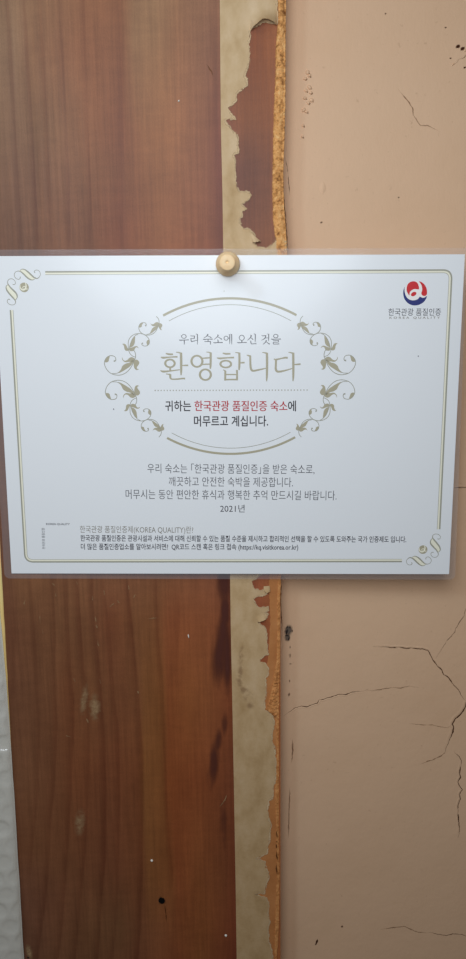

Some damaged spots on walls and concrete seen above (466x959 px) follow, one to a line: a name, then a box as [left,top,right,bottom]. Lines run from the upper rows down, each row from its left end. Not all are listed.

crack [284,687,396,717]
crack [373,610,466,837]